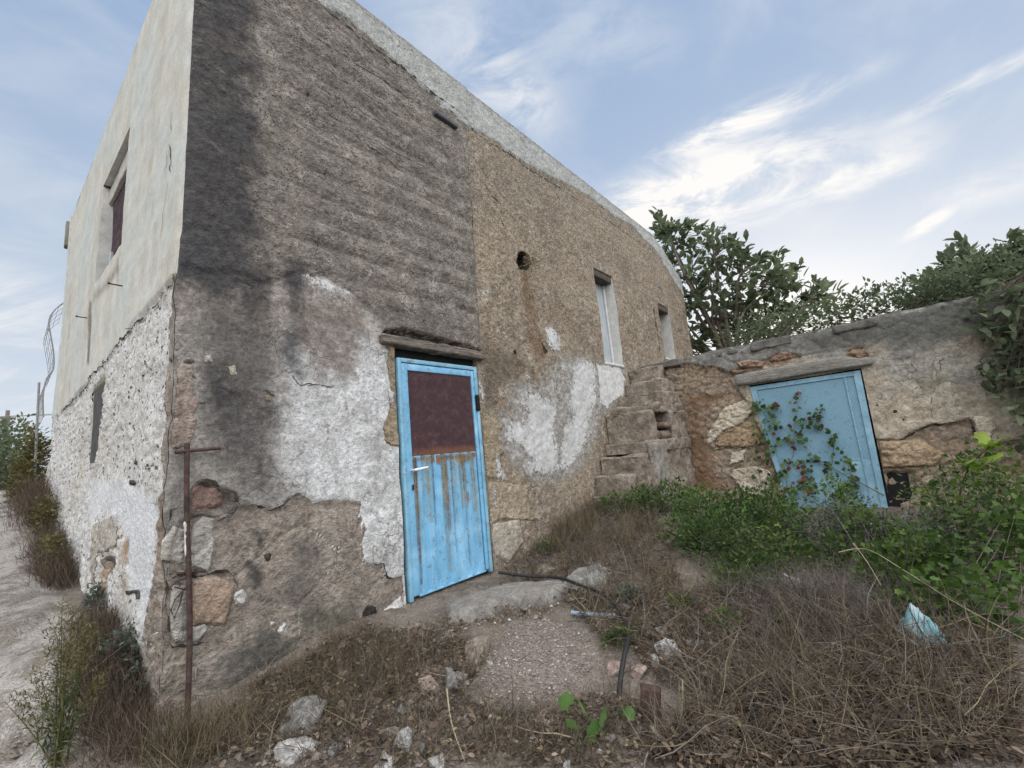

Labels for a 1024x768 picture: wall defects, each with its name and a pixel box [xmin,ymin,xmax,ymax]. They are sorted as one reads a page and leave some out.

leakage [175,0,269,458]
leakage [285,265,360,376]
flaking render [125,273,404,720]
rust [413,452,476,519]
peeling [479,326,626,564]
flaking render [707,398,772,498]